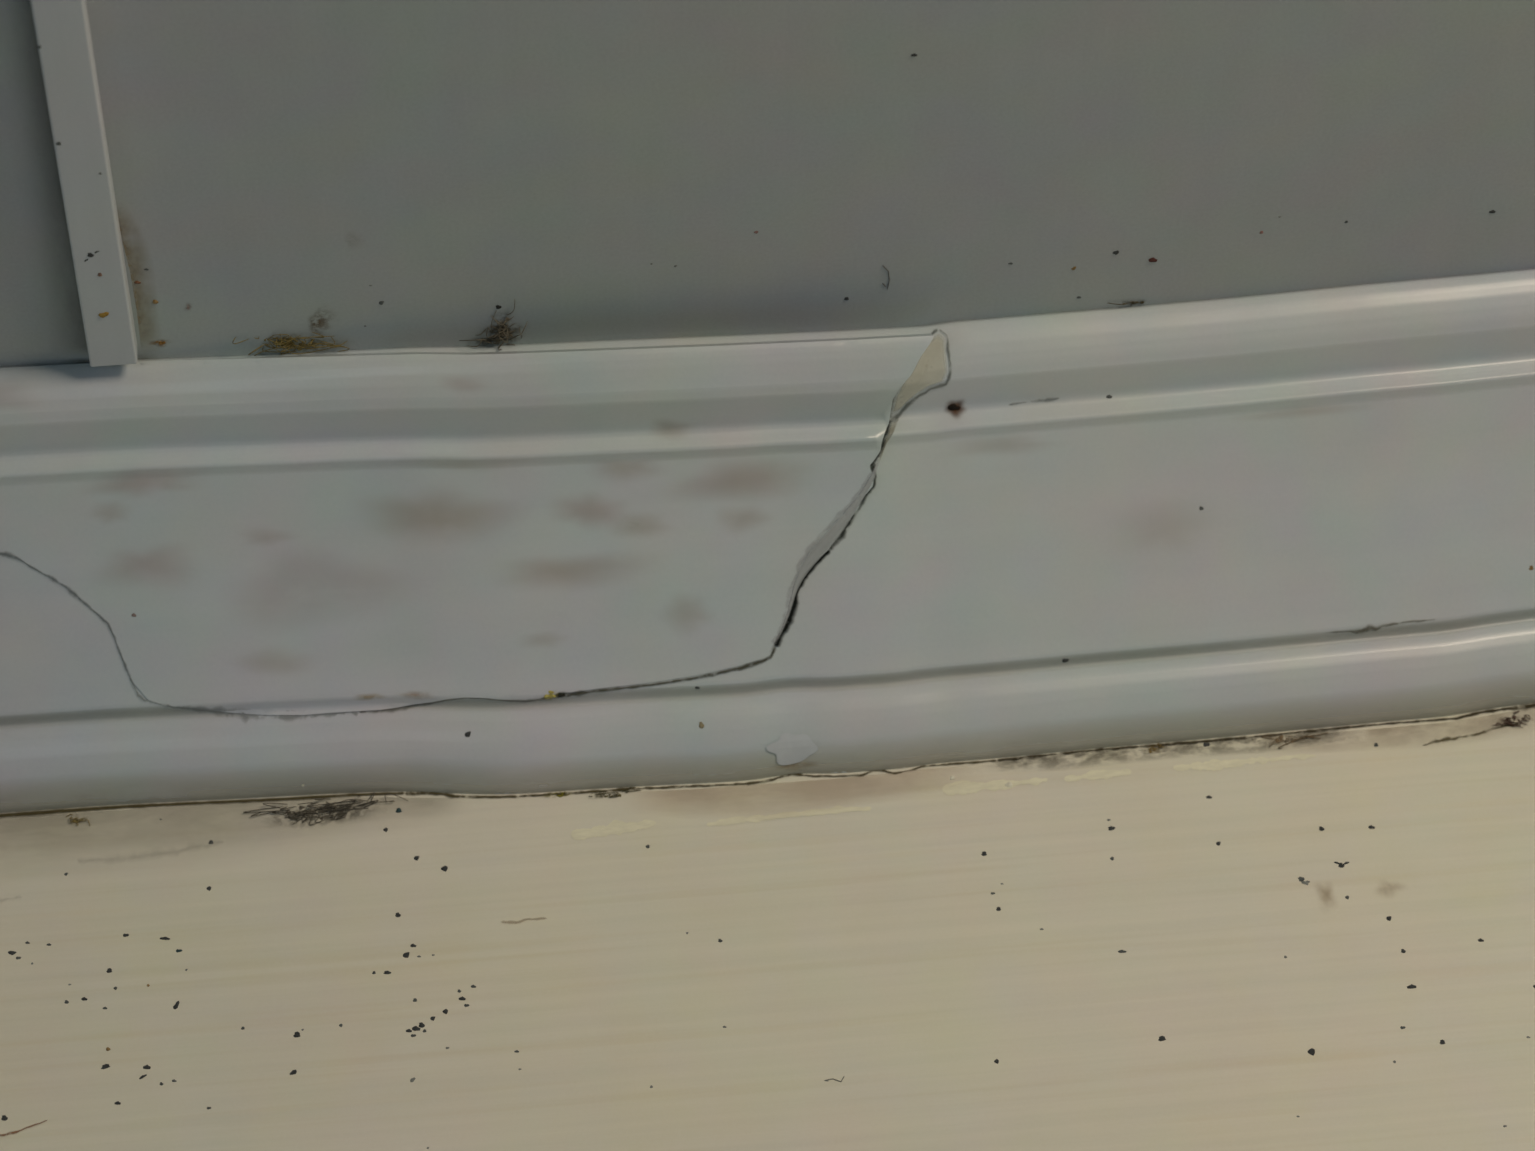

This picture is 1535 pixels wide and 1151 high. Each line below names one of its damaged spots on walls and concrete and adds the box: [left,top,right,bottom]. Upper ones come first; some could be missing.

crack [360,329,951,712]
water stain [1492,711,1530,728]
water stain [1262,732,1328,749]
water stain [589,787,641,798]